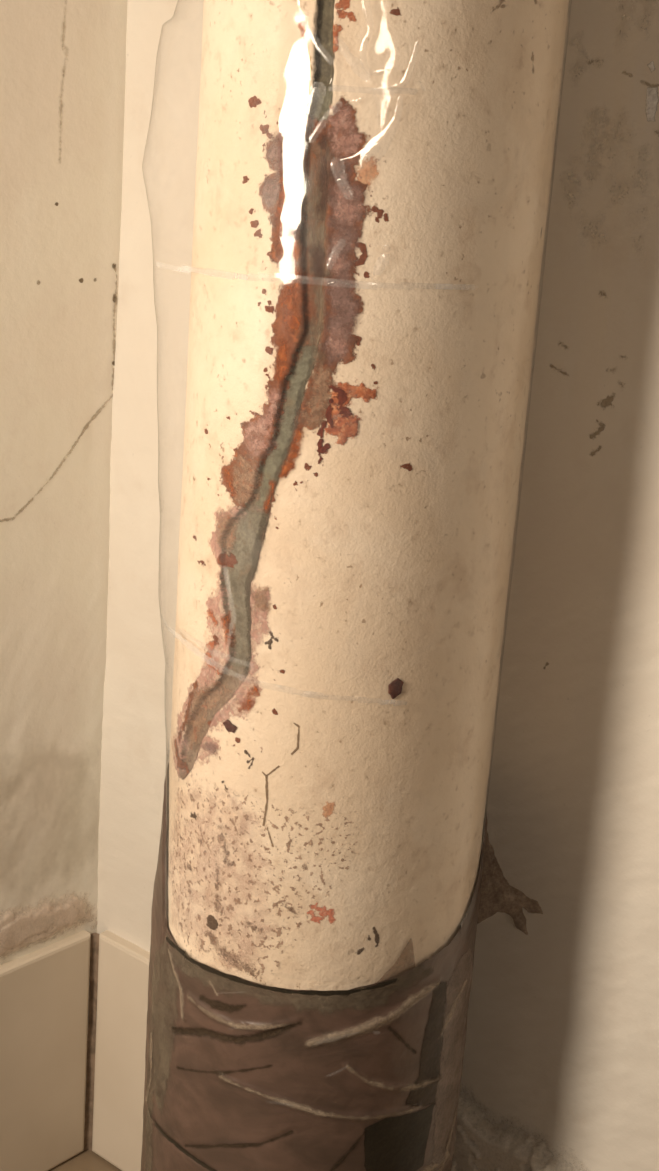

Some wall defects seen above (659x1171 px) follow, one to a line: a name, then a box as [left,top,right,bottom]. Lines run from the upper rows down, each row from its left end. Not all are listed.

crack [0,410,101,522]
crack [110,264,118,385]
crack [178,0,334,780]
corrosion [171,95,389,775]
damp [172,781,357,980]
crack [262,723,300,847]